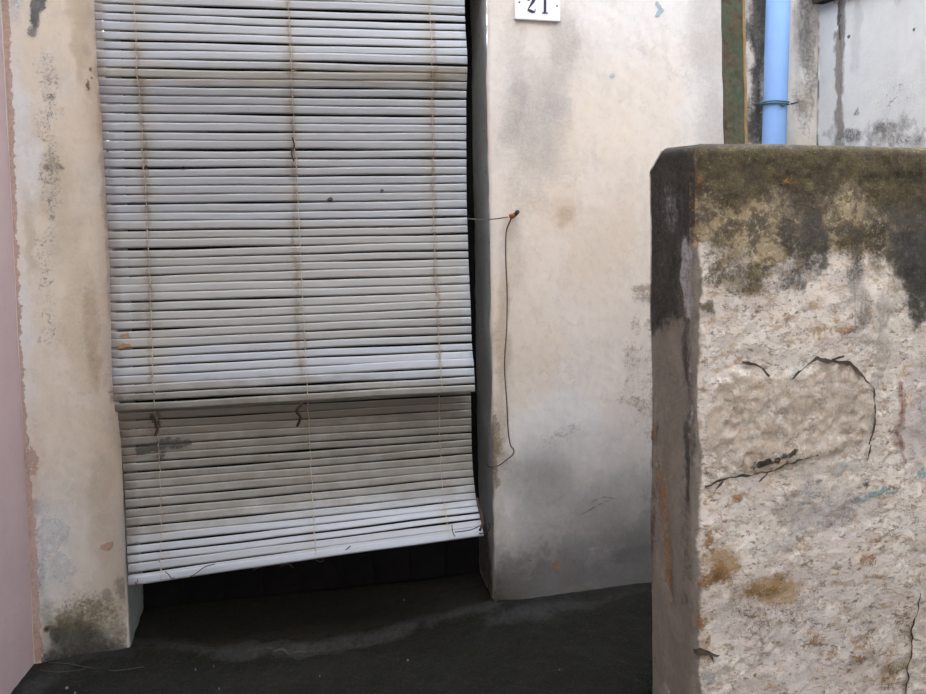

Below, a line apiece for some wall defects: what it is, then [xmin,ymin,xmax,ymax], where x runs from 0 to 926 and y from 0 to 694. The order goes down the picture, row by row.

water stain [27,8,40,37]
water stain [747,0,766,142]
water stain [649,148,695,328]
water stain [704,261,728,284]
crack [742,361,770,377]
crack [792,356,876,460]
crack [705,455,818,489]
water stain [42,600,126,662]
crack [905,593,921,694]